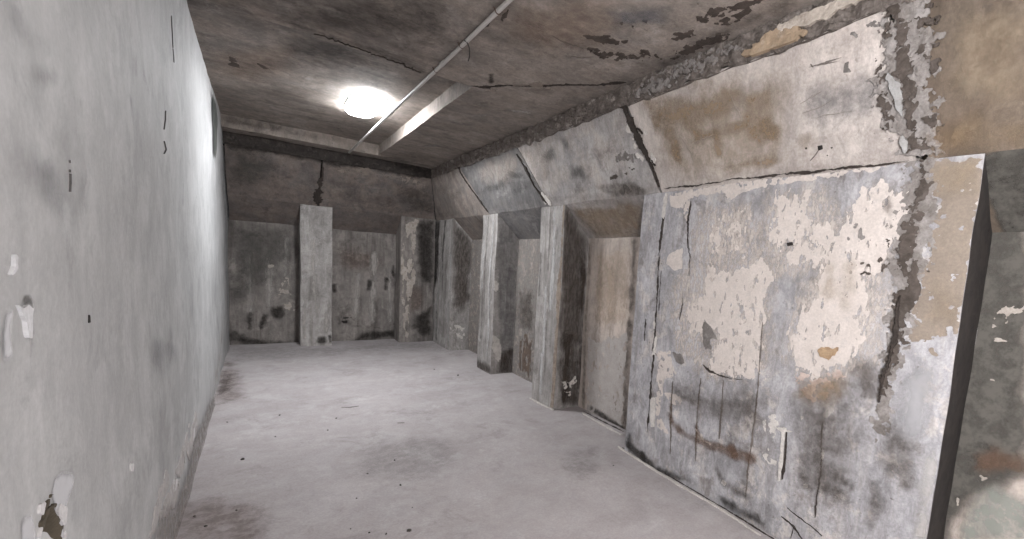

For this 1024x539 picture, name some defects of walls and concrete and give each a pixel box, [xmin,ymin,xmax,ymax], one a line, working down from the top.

spalling [583,0,763,99]
crack [313,165,324,205]
peeling [656,0,983,443]
water stain [415,184,680,479]
crack [473,81,909,539]
water stain [763,414,792,481]
water stain [801,405,851,490]
spalling [37,494,68,539]
water stain [718,474,760,523]